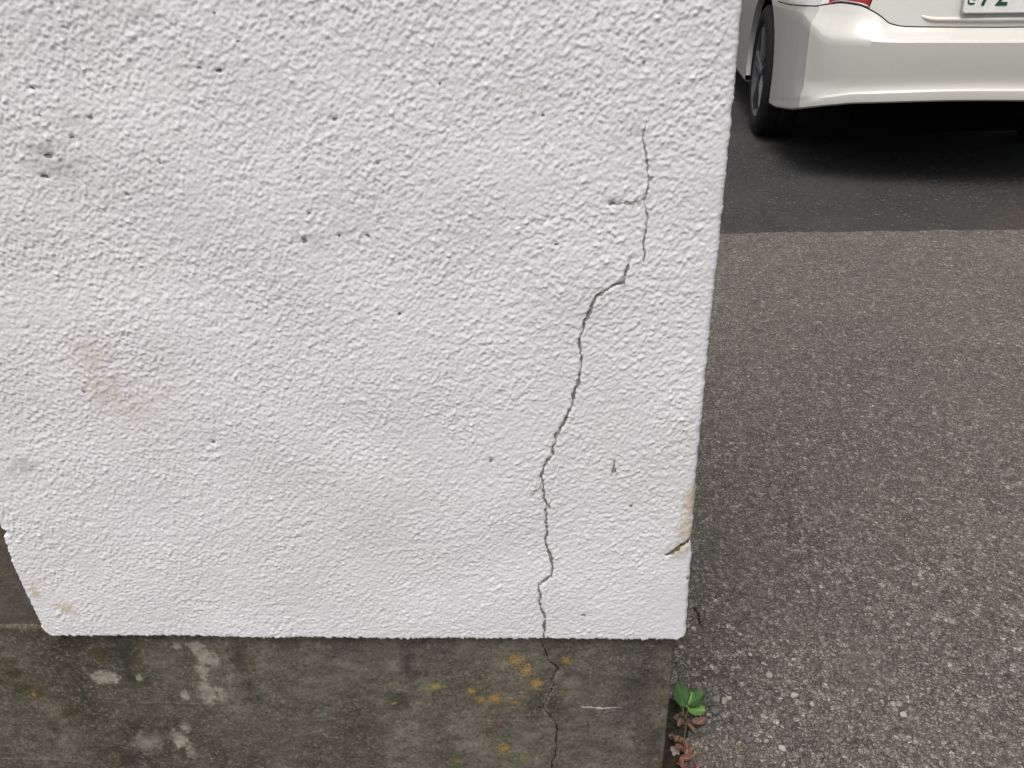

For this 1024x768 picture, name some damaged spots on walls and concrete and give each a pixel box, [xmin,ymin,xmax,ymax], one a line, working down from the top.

crack [531,121,653,768]
crack [666,537,690,555]